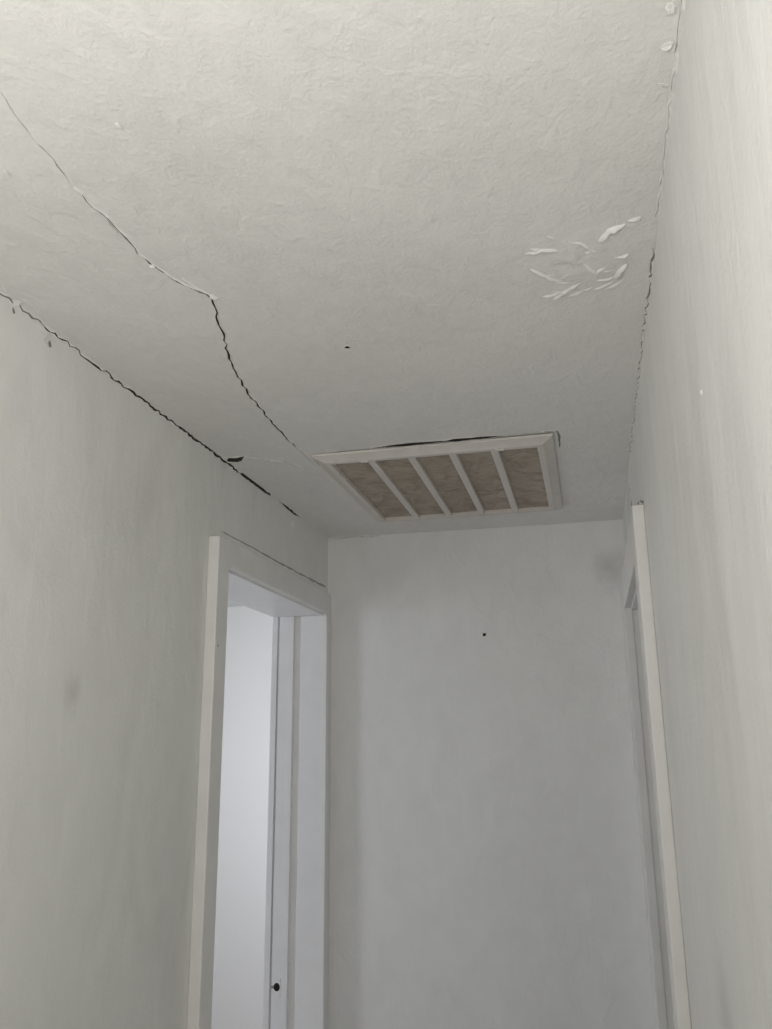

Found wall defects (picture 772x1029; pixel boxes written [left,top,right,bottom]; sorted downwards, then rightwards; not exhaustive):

crack [0,91,312,462]
crack [0,287,300,529]
crack [221,530,326,588]